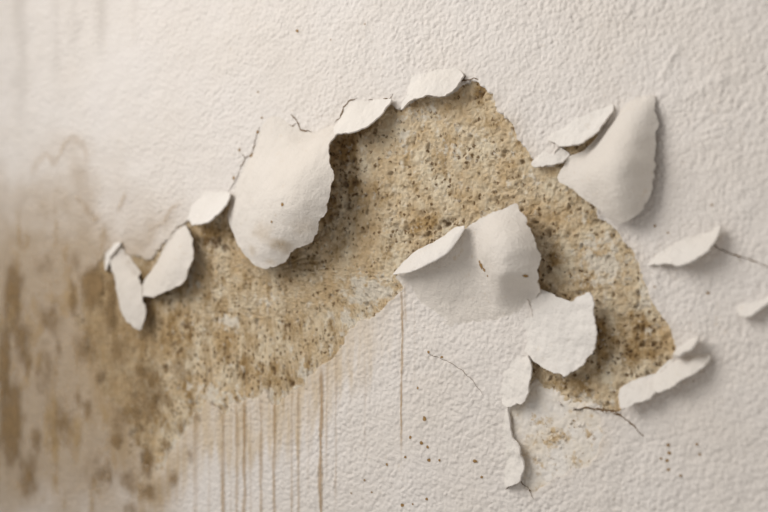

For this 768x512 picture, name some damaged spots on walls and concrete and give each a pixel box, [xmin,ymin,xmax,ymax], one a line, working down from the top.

spalling [76,66,721,492]
crack [714,244,767,267]
damp [0,222,139,512]
crack [574,407,643,436]
damp [127,448,152,501]